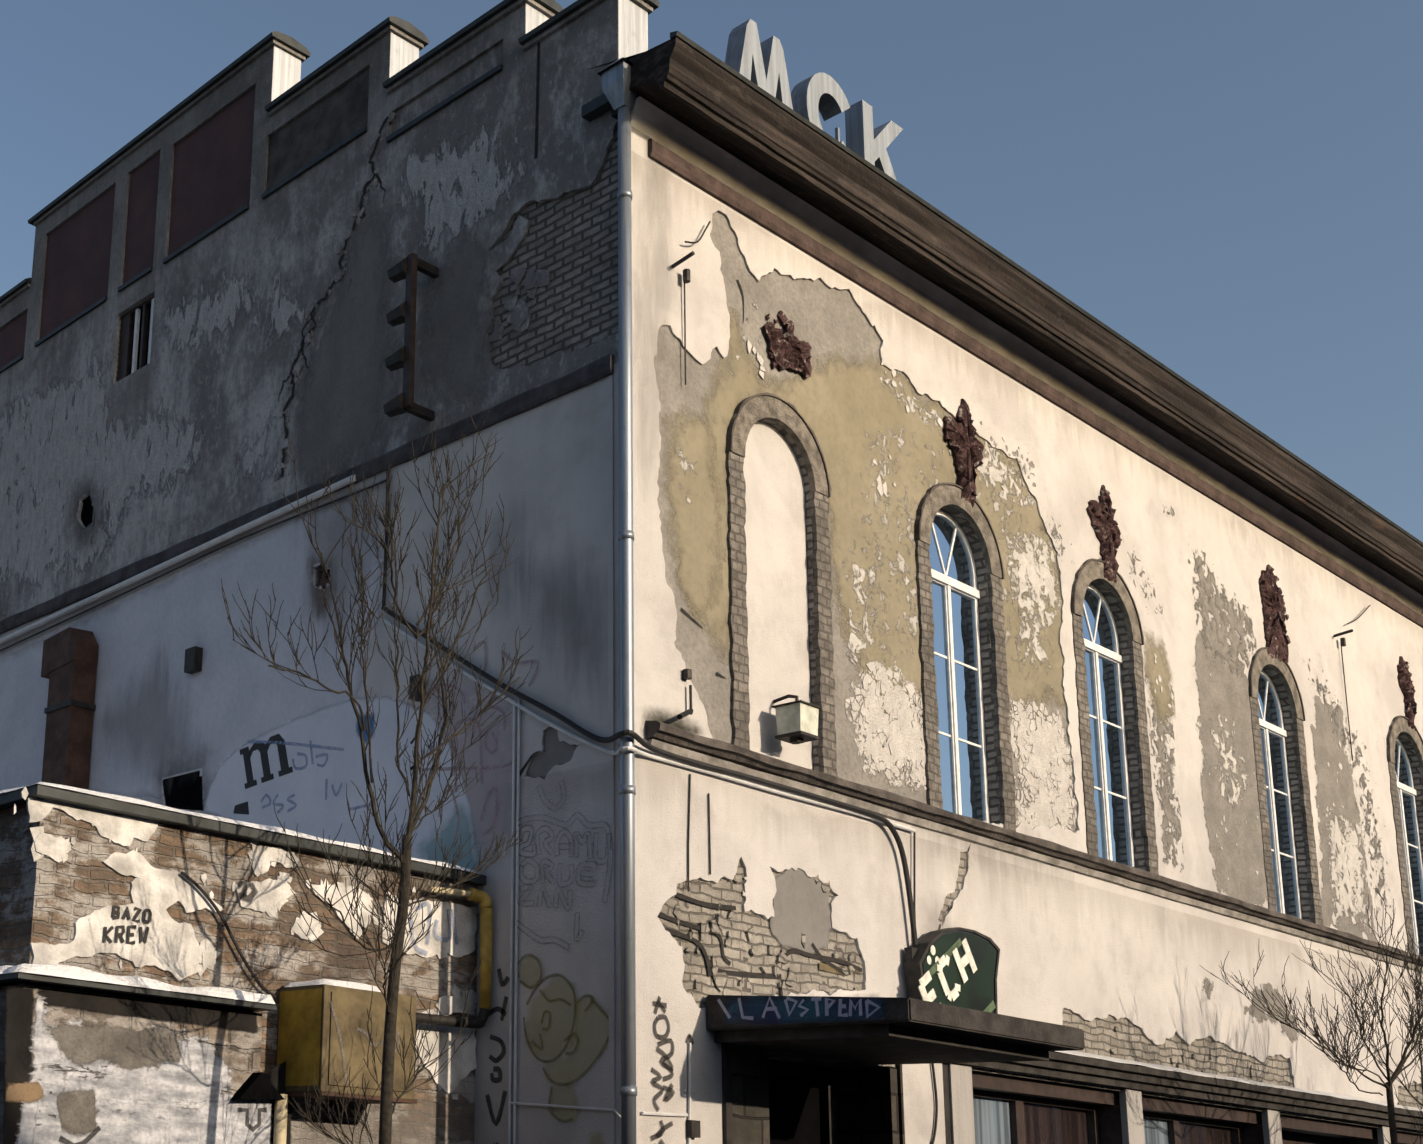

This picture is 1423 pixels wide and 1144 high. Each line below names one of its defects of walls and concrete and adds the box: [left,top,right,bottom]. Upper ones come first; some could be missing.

crack [274,112,395,481]
peeling [654,211,1078,833]
peeling [1123,541,1163,614]
spalling [163,771,204,811]
peeling [13,786,479,981]
flaking render [657,860,863,1008]
peeling [1145,637,1184,872]
peeling [1188,550,1268,906]
peeling [1302,658,1393,943]
peeling [415,984,477,1100]
flaking render [1062,983,1298,1087]